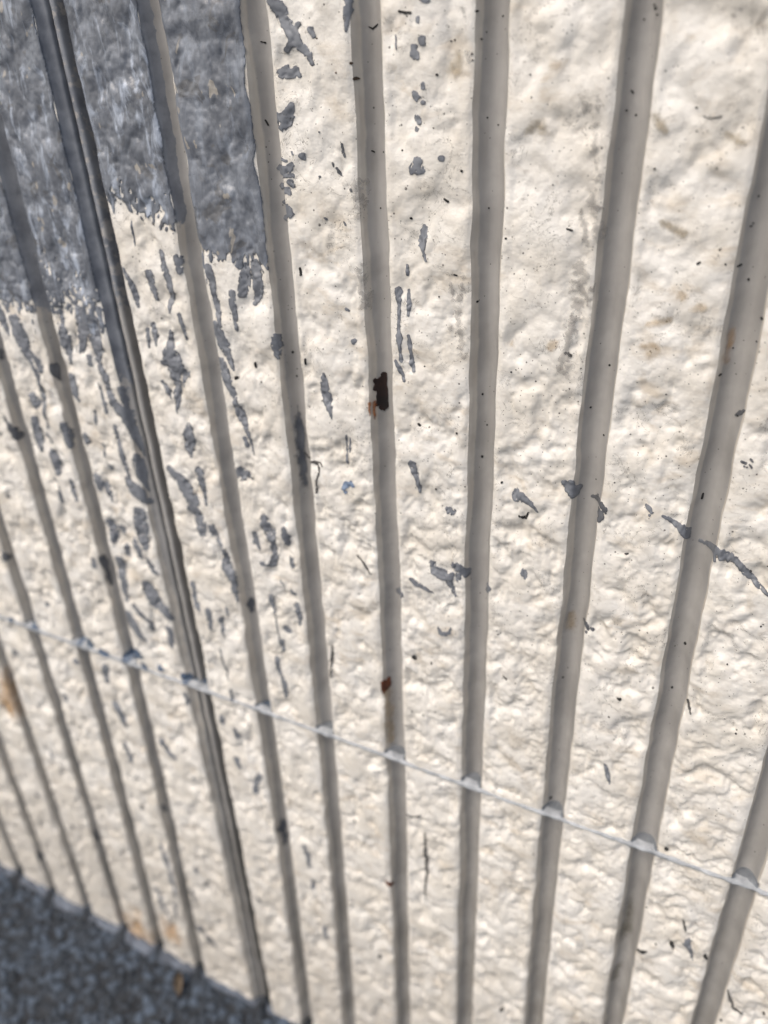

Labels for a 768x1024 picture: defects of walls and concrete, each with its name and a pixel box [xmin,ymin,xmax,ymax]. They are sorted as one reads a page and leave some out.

peeling [266,0,318,79]
peeling [398,10,426,60]
peeling [265,102,295,132]
peeling [276,151,306,221]
peeling [409,156,425,175]
peeling [122,249,190,414]
peeling [204,258,264,455]
peeling [394,264,425,382]
peeling [0,305,175,684]
peeling [561,480,608,523]
peeling [166,422,239,705]
peeling [429,560,471,597]